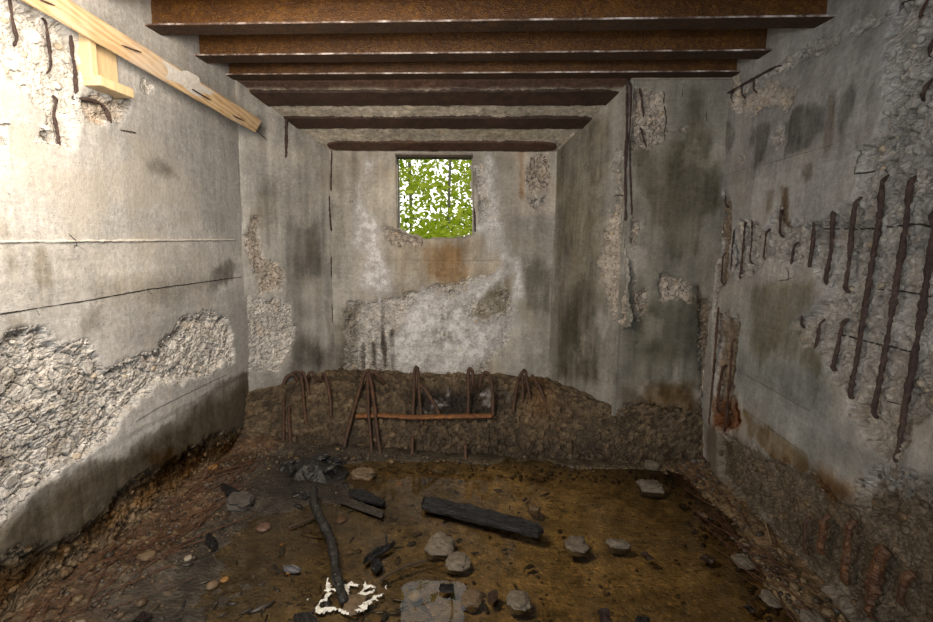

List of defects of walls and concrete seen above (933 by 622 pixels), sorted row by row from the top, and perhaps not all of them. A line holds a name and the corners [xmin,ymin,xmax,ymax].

spalling [0,0,131,151]
spalling [0,309,236,527]
crack [0,277,240,315]
spalling [243,214,297,374]
spalling [340,272,518,374]
leakage [373,155,524,373]
corrosion [624,79,647,221]
spalling [596,0,933,622]
corrosion [823,210,837,285]
corrosion [830,174,890,399]
corrosion [870,175,917,419]
corrosion [893,211,933,463]